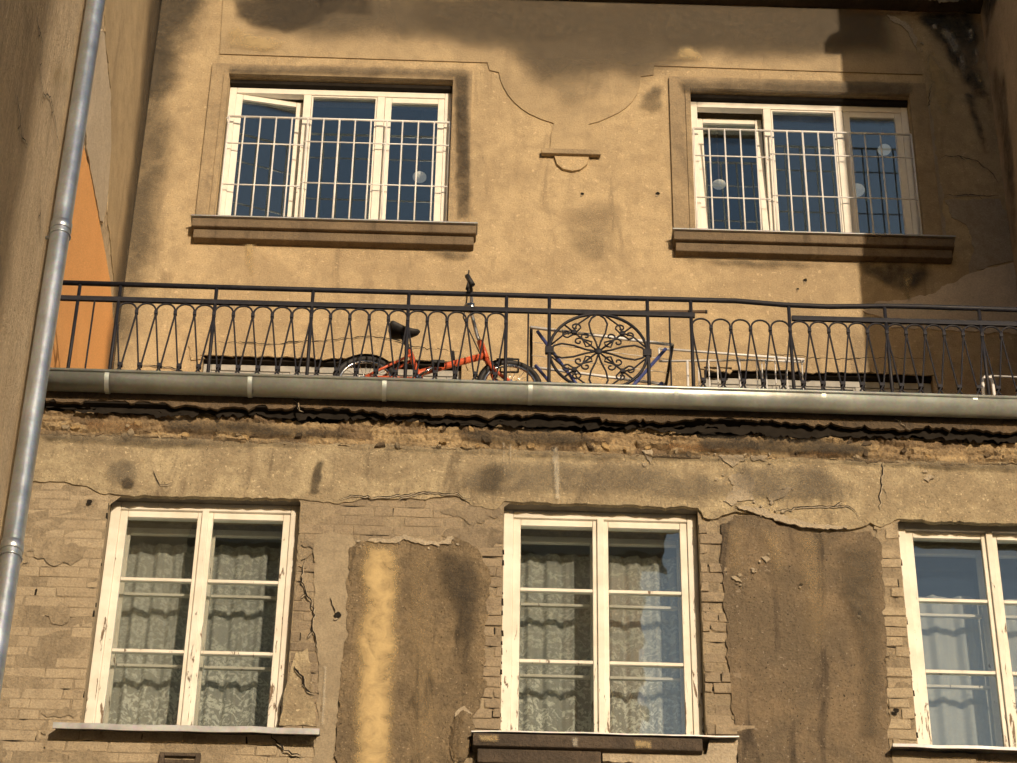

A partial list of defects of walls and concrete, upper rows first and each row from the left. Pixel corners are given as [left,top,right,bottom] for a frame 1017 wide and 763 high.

crack [17,10,59,146]
leakage [921,11,1013,196]
spalling [40,408,1017,530]
spalling [0,482,510,763]
crack [294,666,313,694]
crack [300,559,336,652]
leakage [358,549,396,763]
spalling [973,753,1017,763]